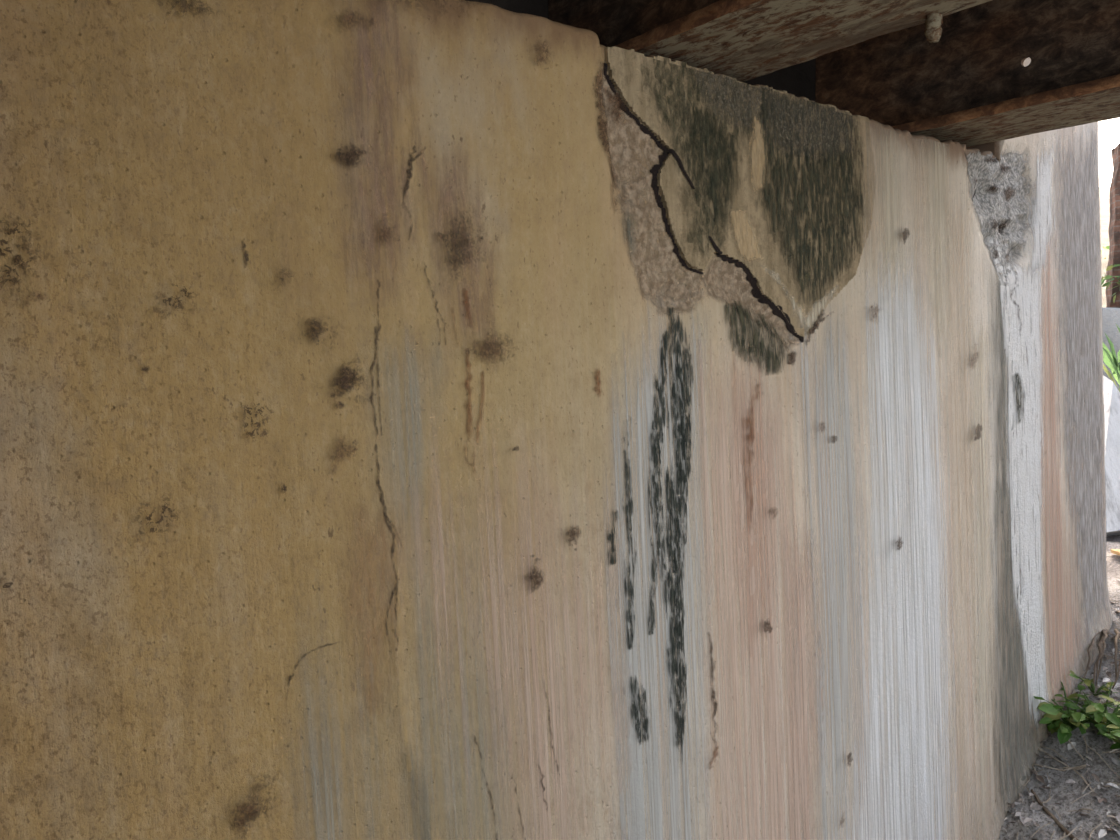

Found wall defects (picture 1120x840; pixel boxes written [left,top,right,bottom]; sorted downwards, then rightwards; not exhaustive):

leakage [0,221,36,286]
crack [604,63,829,344]
flaking render [601,46,877,348]
leakage [607,141,991,840]
peeling [965,151,1049,730]
leakage [494,555,602,840]